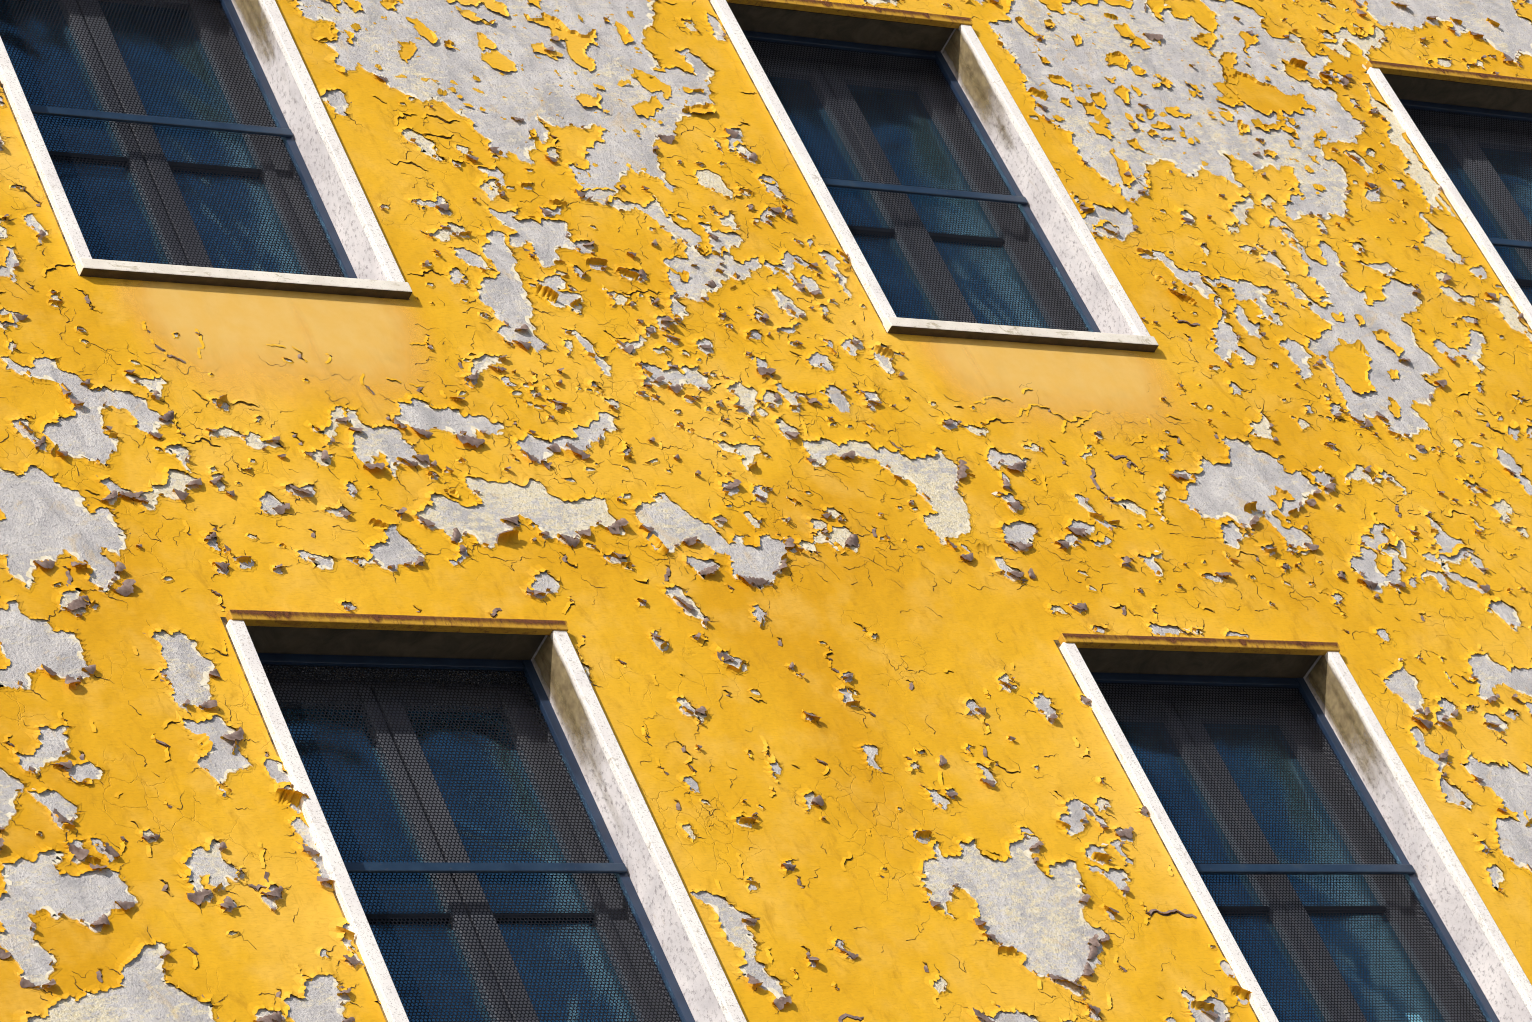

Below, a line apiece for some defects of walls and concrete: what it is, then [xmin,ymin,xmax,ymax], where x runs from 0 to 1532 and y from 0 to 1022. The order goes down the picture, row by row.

crack [4,176,42,208]
peeling [0,0,1532,700]
crack [65,459,102,496]
crack [62,566,73,586]
crack [2,733,15,750]
peeling [1368,625,1532,899]
peeling [0,719,227,1022]
peeling [173,832,292,916]
peeling [247,917,365,1022]
peeling [685,874,793,1014]
crack [764,915,1000,1022]
peeling [905,775,1151,1022]